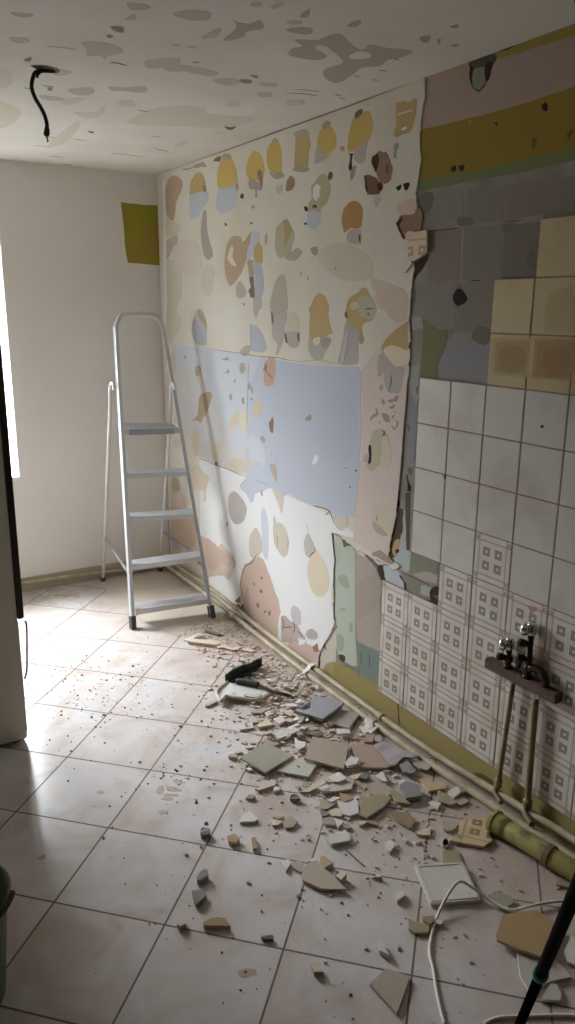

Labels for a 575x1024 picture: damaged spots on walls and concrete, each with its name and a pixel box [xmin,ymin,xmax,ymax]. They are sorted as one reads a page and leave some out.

peeling [81,2,151,60]
peeling [144,10,278,97]
peeling [286,8,413,83]
spalling [468,53,497,90]
peeling [165,80,417,443]
spalling [396,208,423,241]
spalling [414,252,430,280]
spalling [453,285,467,308]
peeling [363,322,410,472]
spalling [235,464,329,667]
peeling [357,491,403,580]